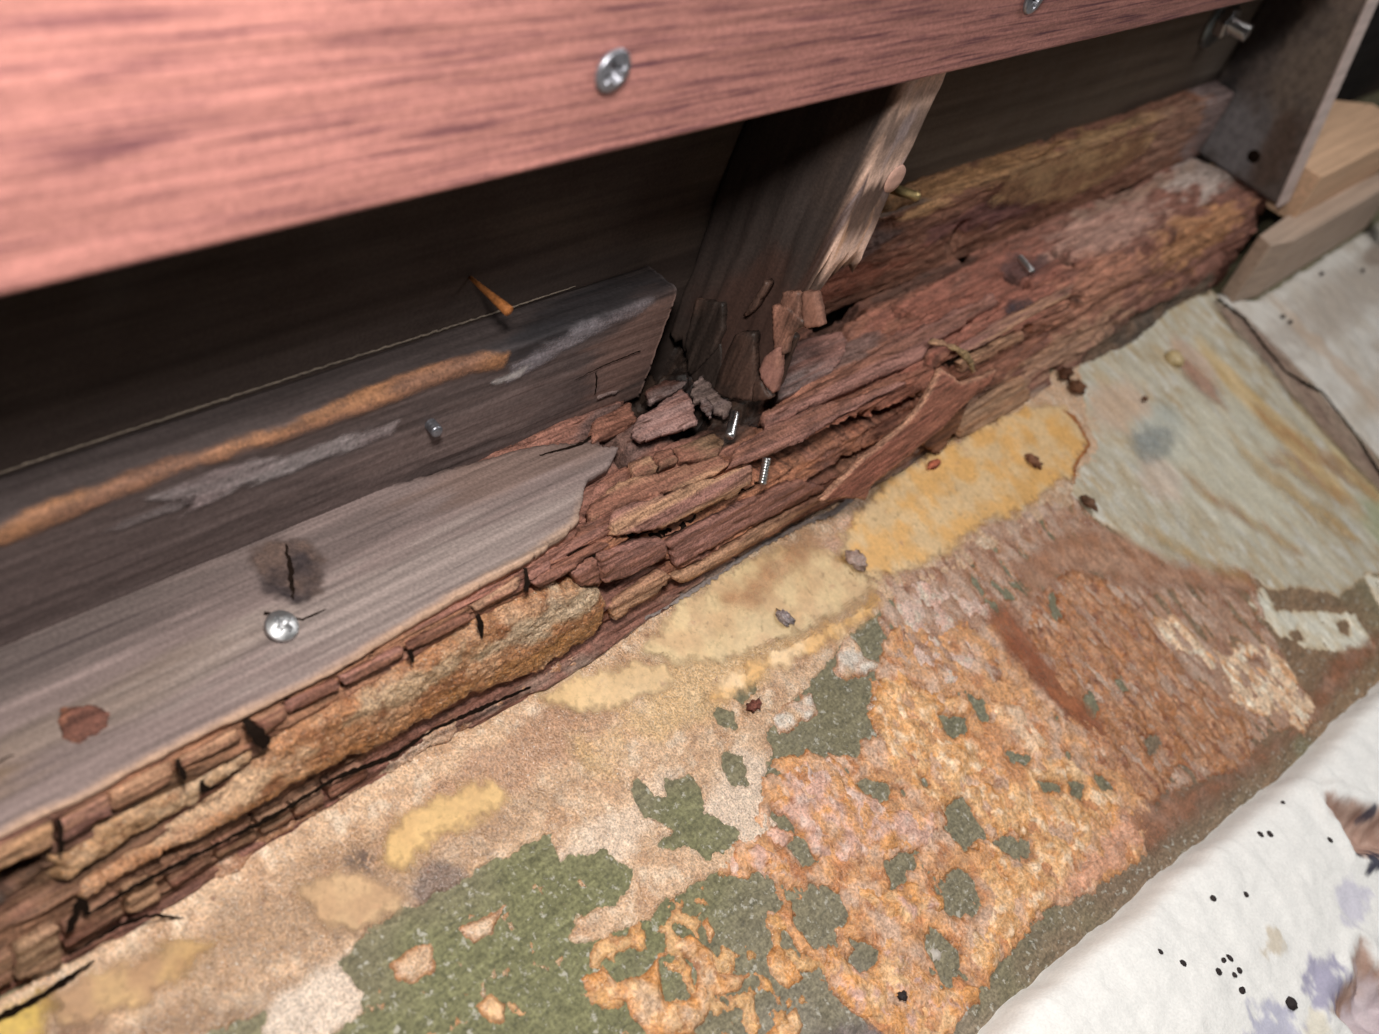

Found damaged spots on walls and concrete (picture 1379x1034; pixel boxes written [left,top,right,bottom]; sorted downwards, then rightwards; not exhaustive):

crack [263,544,326,621]
peeling [581,620,1150,1034]
peeling [507,1002,526,1016]